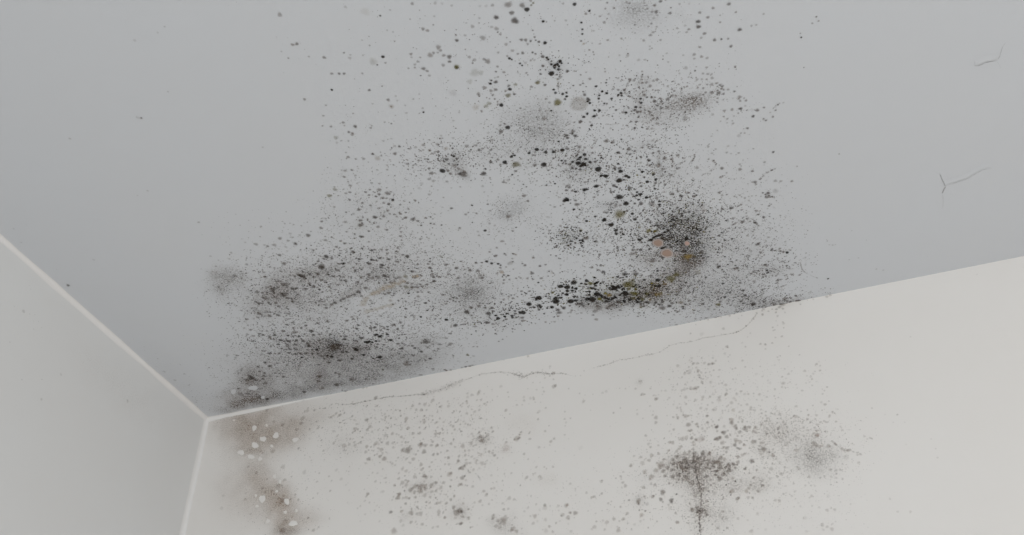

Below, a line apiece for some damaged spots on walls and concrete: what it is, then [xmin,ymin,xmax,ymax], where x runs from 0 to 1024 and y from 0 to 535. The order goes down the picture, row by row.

leakage [206,37,812,461]